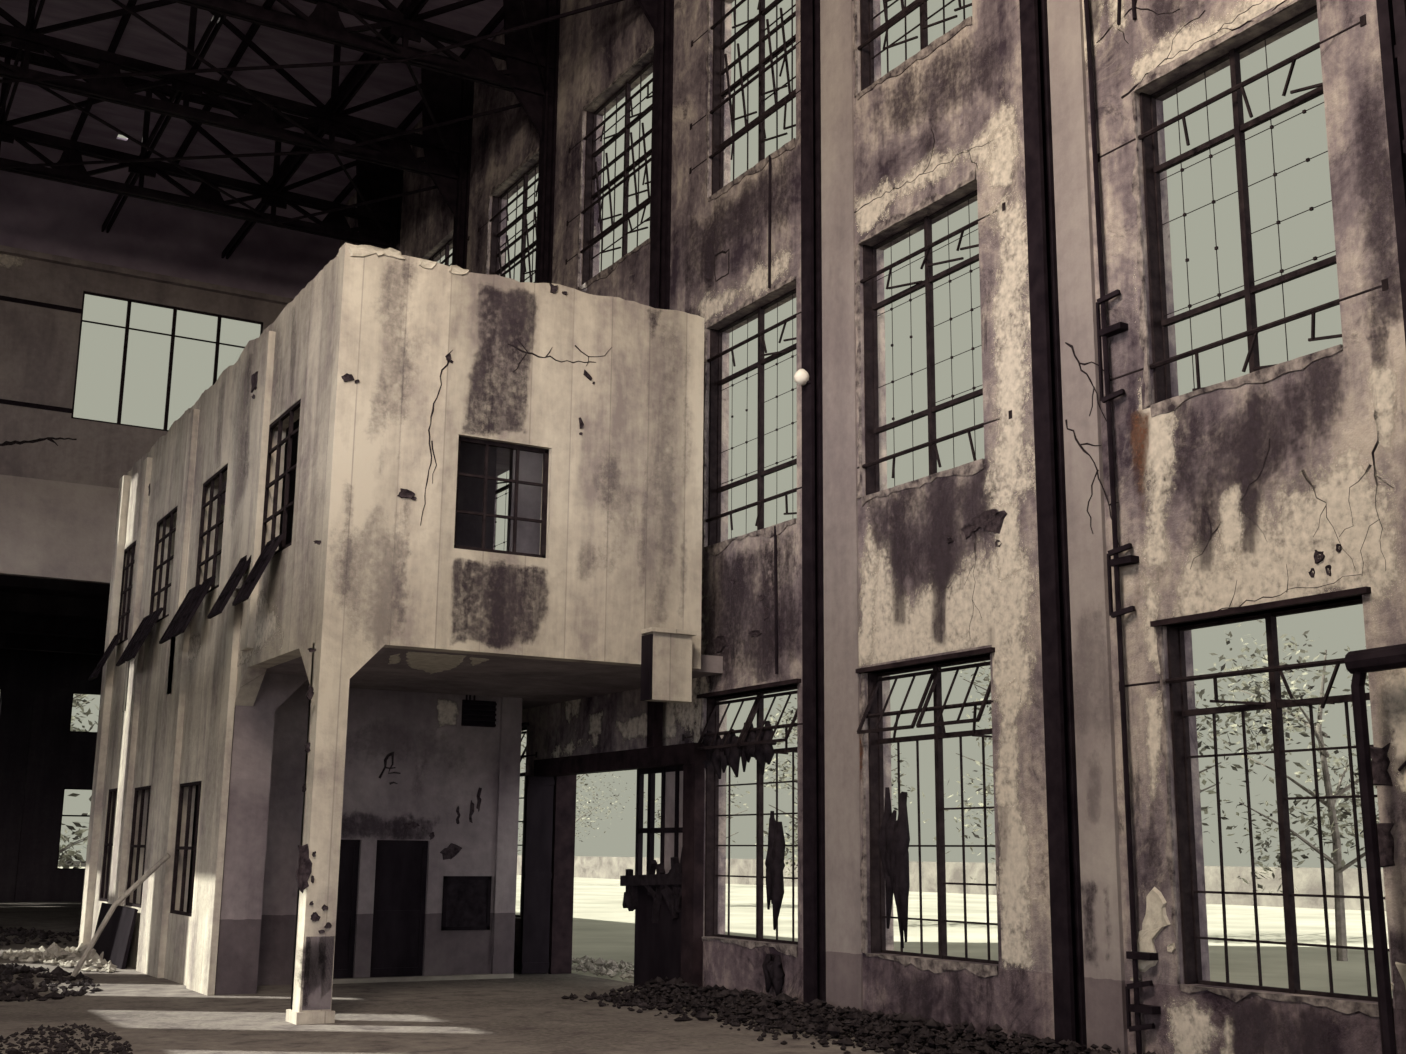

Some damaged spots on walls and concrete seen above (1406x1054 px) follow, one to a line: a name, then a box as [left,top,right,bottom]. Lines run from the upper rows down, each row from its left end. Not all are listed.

crack [0,437,77,446]
crack [420,351,452,526]
water stain [463,286,537,433]
water stain [452,559,548,648]
water stain [707,535,796,688]
water stain [868,461,995,643]
water stain [1179,356,1340,561]
peeling [1130,0,1400,1017]
peeling [1370,668,1406,867]
peeling [1391,962,1406,991]